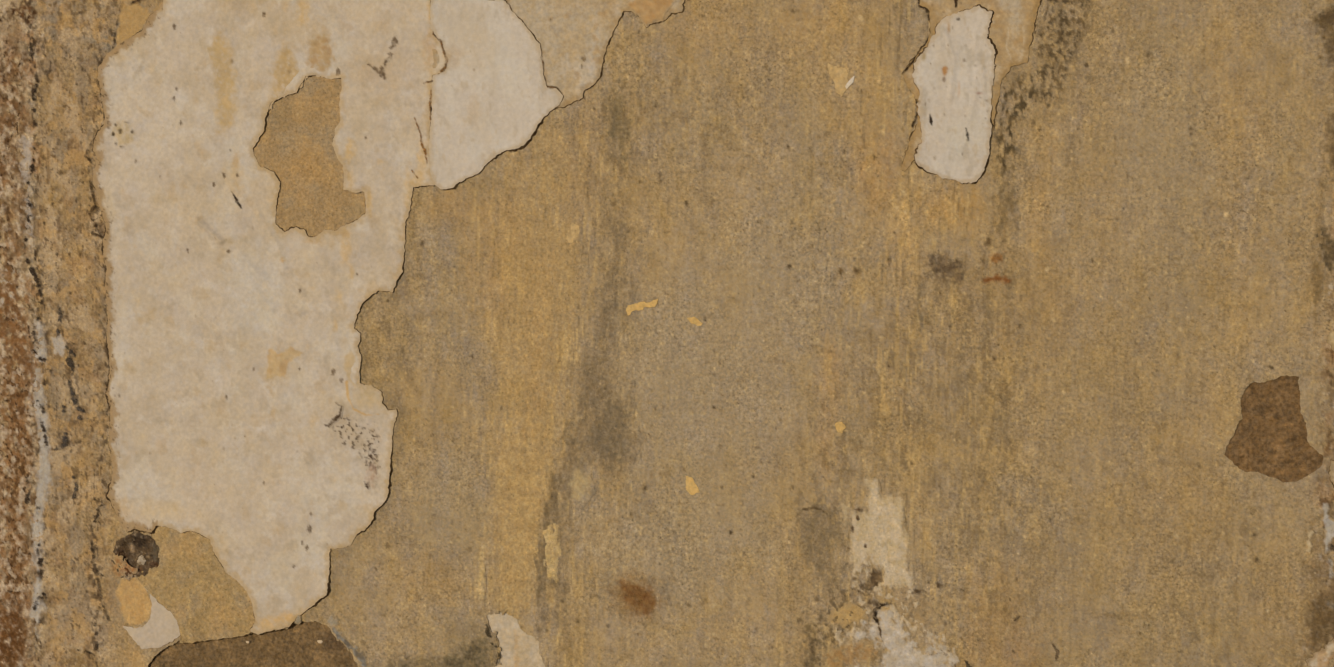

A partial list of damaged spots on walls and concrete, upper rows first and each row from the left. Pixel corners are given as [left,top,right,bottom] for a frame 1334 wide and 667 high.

peeling [900,0,1042,184]
peeling [92,0,685,667]
peeling [685,476,700,495]
spalling [1225,375,1334,488]
corrosion [599,566,673,630]
peeling [1305,638,1334,667]